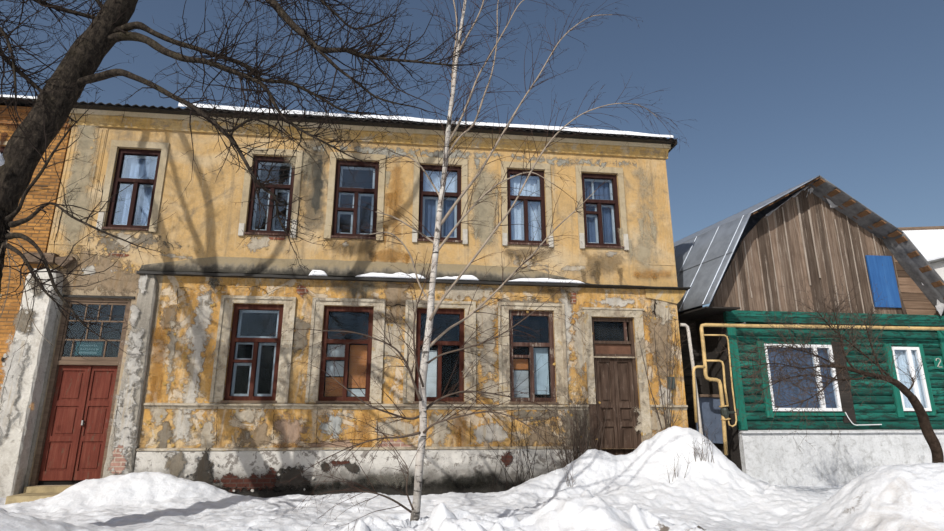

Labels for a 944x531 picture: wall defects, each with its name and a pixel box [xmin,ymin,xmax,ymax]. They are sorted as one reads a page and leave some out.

water stain [298,141,329,227]
peeling [0,305,36,439]
spalling [50,125,360,493]
peeling [375,419,415,451]
spalling [381,282,412,362]
peeling [436,283,601,468]